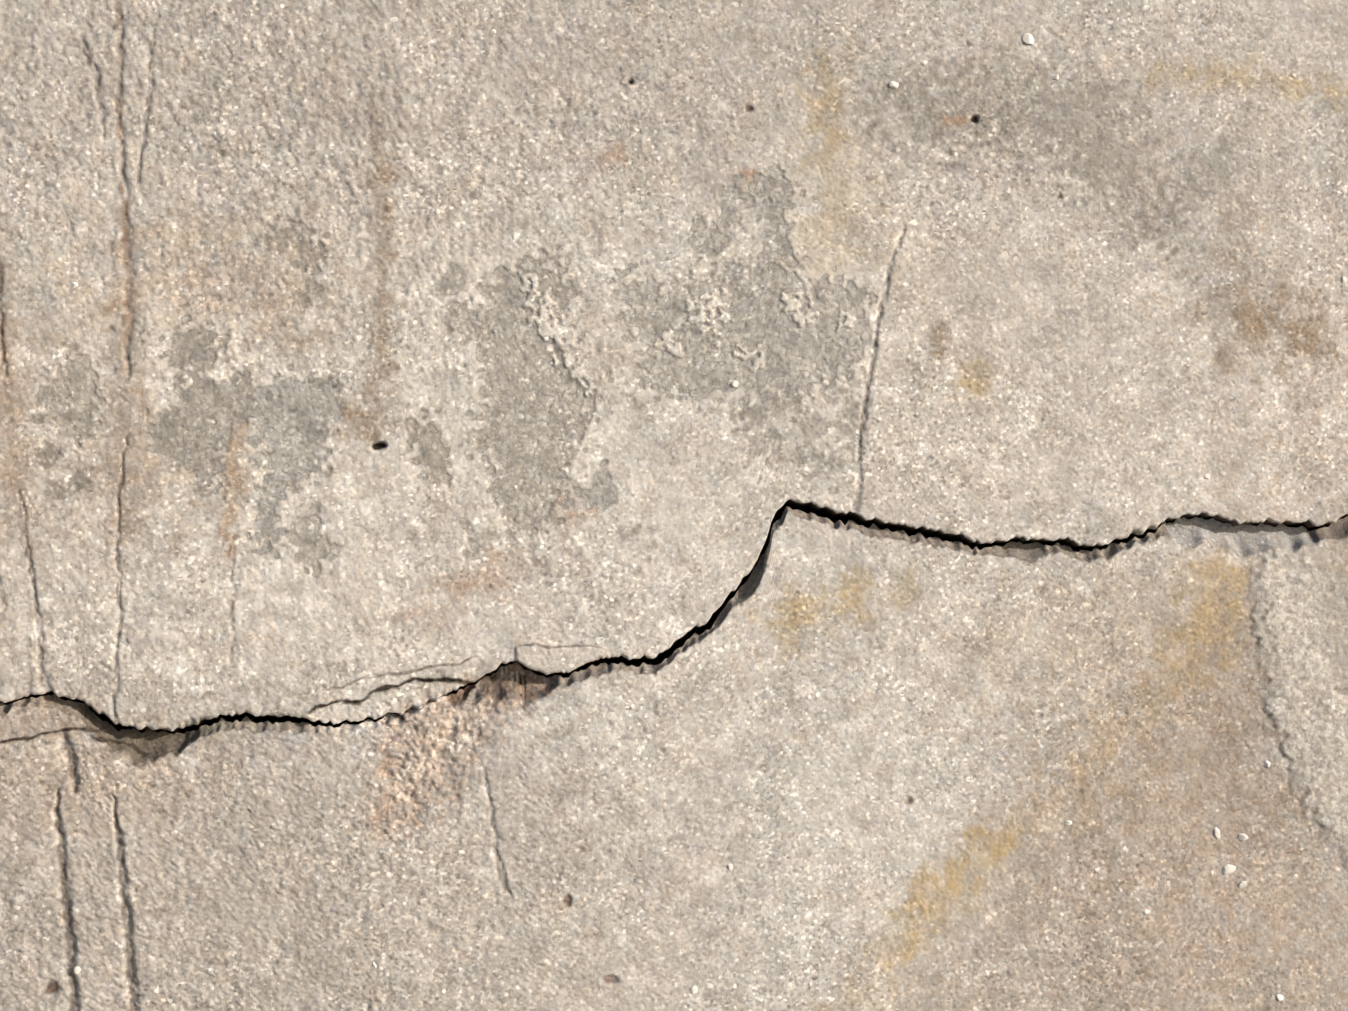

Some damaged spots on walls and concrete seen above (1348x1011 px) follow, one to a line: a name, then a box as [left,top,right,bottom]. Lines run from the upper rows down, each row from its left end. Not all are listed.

crack [0,500,1348,767]